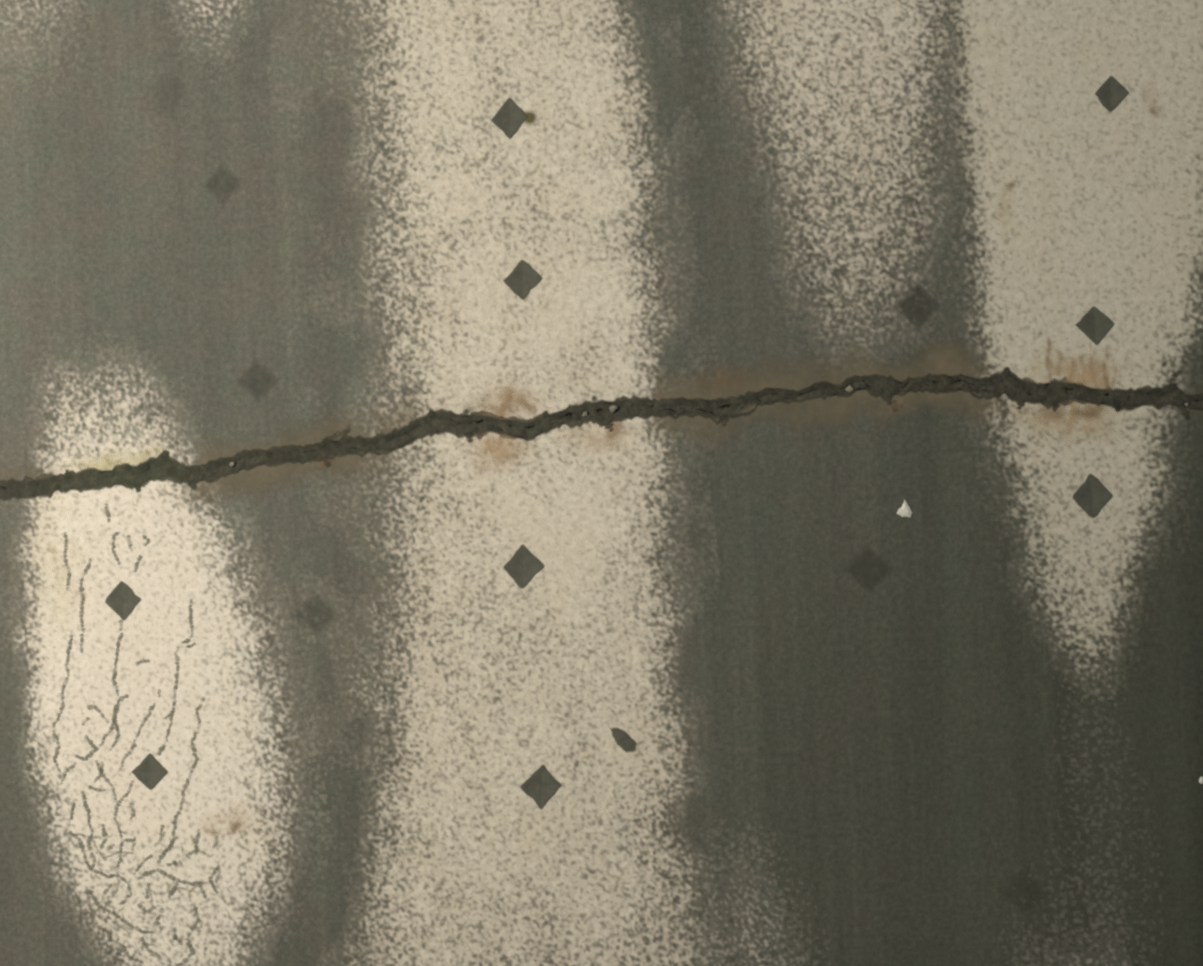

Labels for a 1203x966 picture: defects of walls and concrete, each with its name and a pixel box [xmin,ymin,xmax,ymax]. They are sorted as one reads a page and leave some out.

crack [0,367,1203,966]